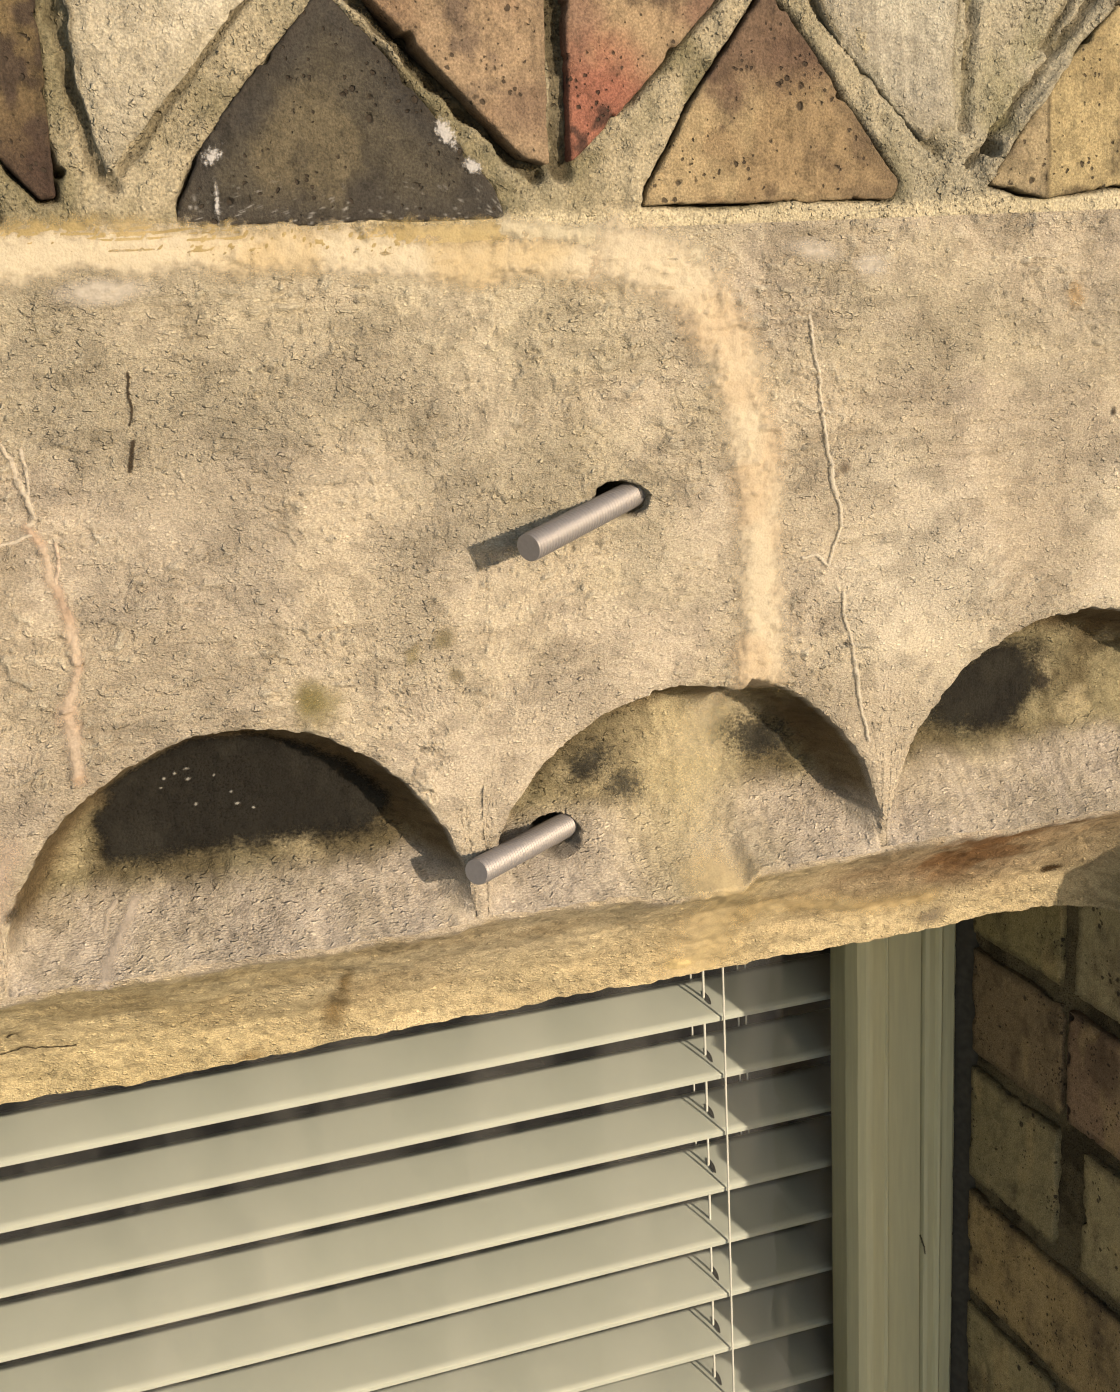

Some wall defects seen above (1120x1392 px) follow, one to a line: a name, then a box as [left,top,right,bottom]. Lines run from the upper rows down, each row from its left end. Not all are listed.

crack [0,216,871,785]
crack [665,865,932,977]